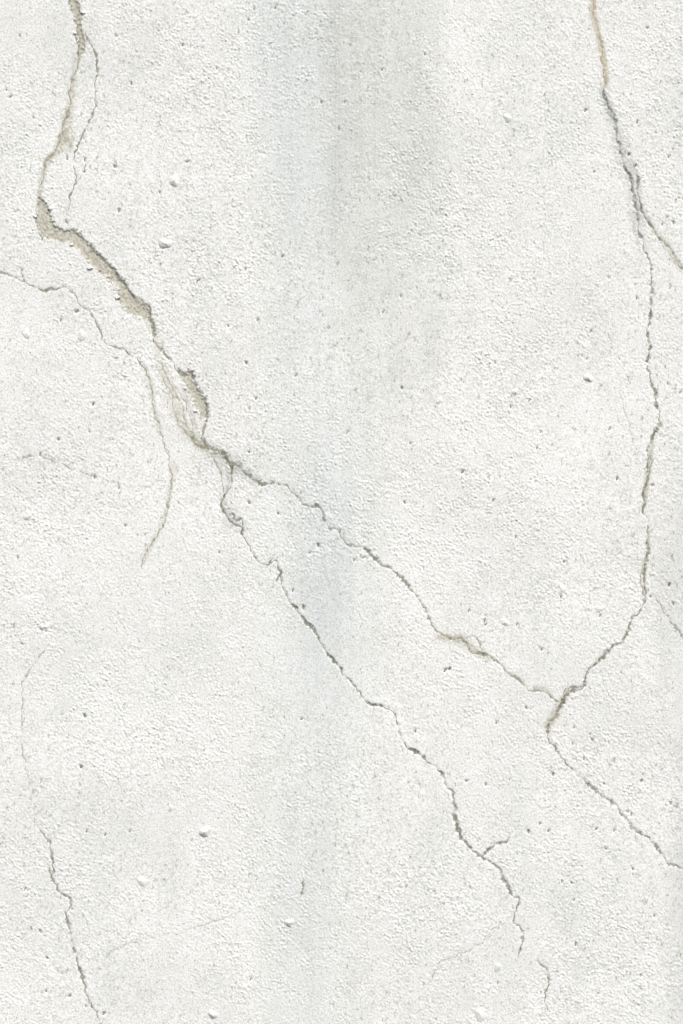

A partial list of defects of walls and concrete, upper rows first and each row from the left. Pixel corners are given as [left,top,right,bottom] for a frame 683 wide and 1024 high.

crack [35,0,99,235]
crack [603,90,660,513]
crack [0,219,683,953]
crack [40,830,98,1018]